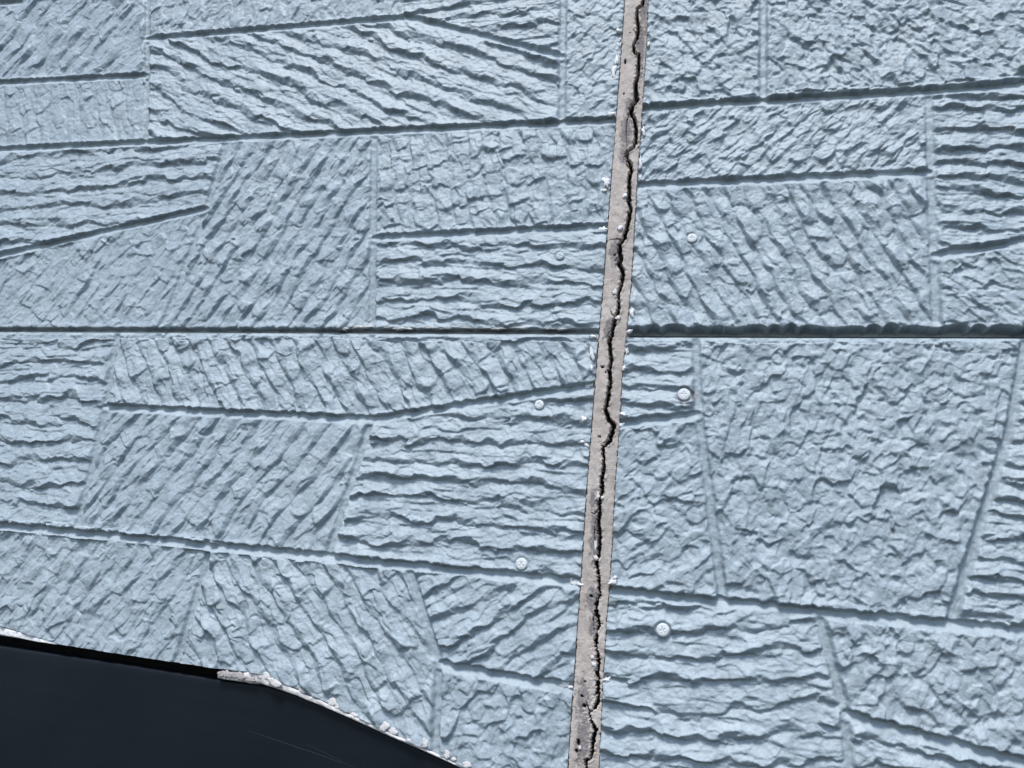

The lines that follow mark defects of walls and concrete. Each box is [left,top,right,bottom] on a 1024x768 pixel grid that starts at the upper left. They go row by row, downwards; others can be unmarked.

crack [576,0,645,768]